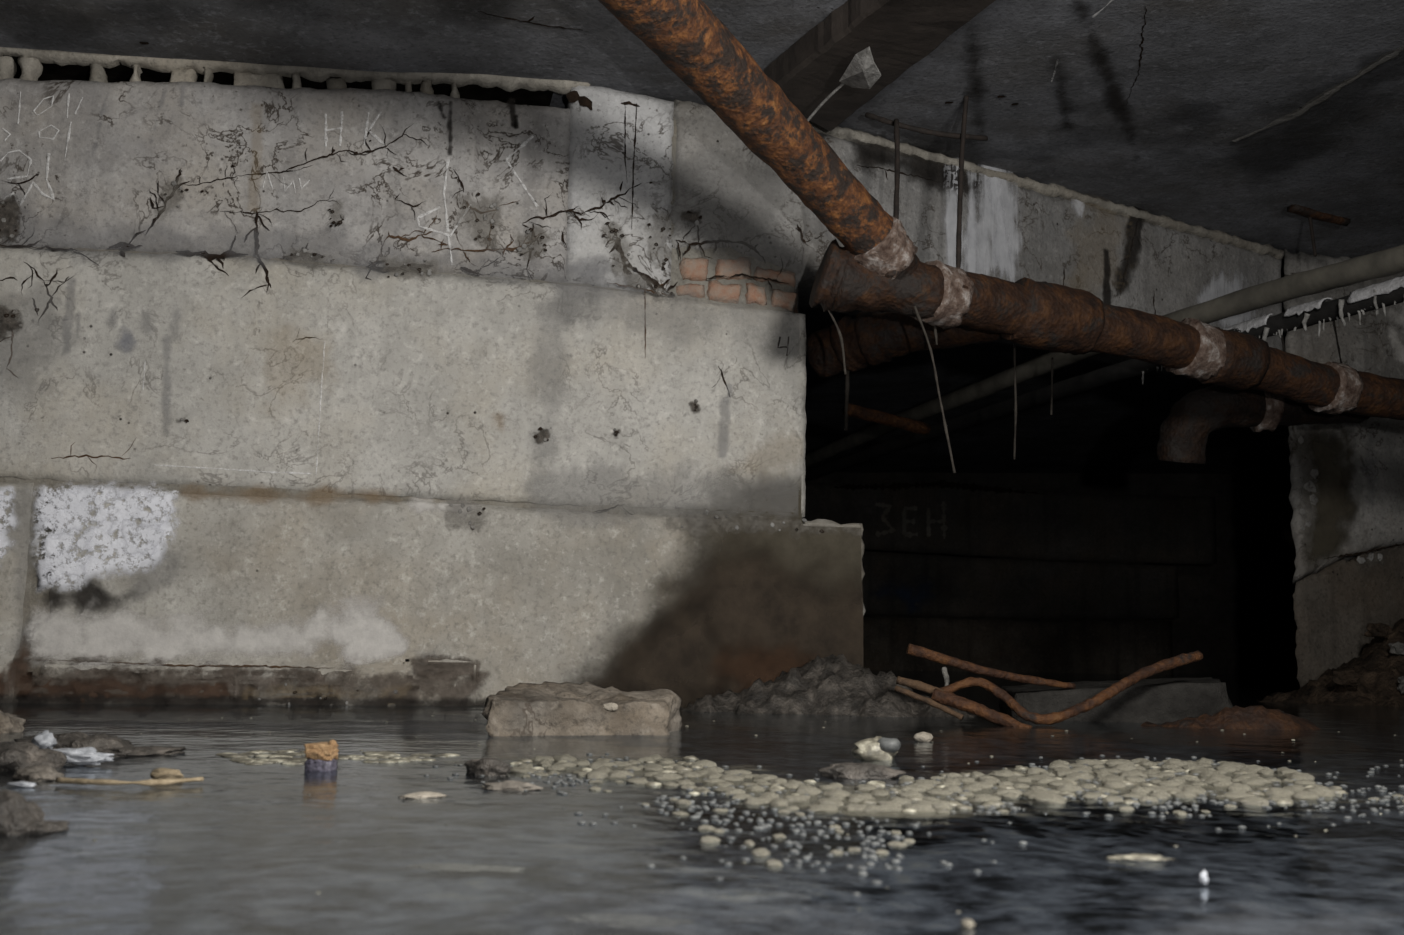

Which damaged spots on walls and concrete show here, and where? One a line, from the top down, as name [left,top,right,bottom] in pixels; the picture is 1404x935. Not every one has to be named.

damp [1091,41,1131,132]
crack [0,123,821,377]
damp [0,581,487,706]
damp [597,483,863,707]